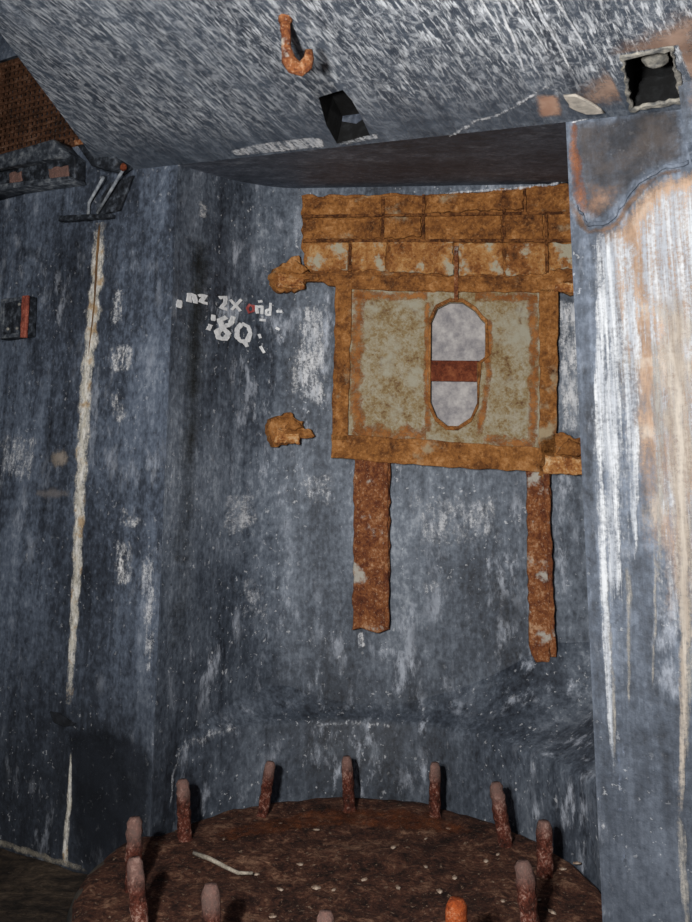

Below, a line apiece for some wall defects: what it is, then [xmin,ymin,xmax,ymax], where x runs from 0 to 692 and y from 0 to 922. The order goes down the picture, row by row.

leakage [68,226,103,692]
leakage [594,186,692,793]
rust [71,842,131,922]
rust [142,797,603,922]
leakage [679,824,688,922]